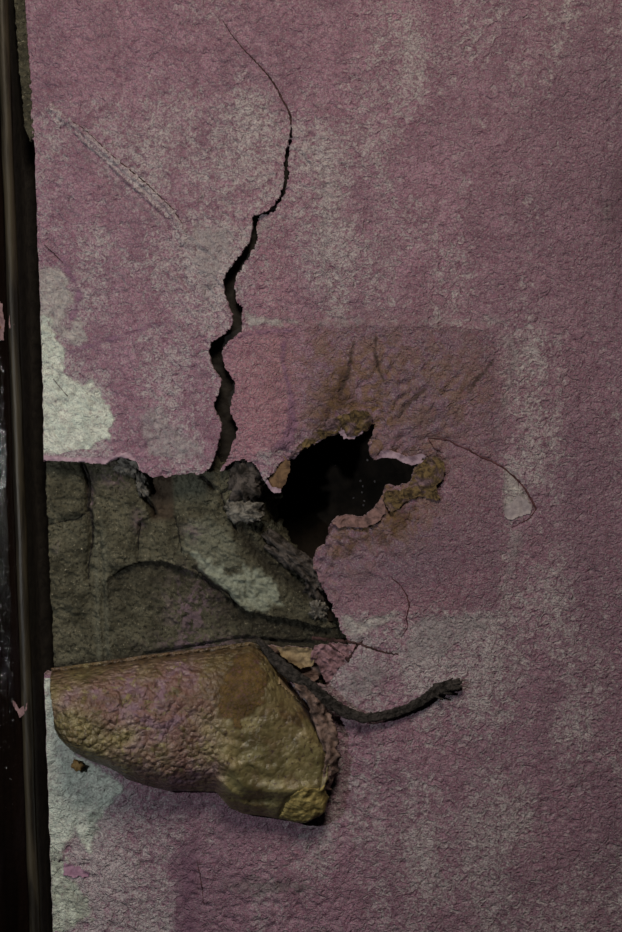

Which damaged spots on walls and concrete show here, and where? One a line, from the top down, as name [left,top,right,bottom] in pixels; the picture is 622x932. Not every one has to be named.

crack [210,21,293,462]
spalling [39,257,446,932]